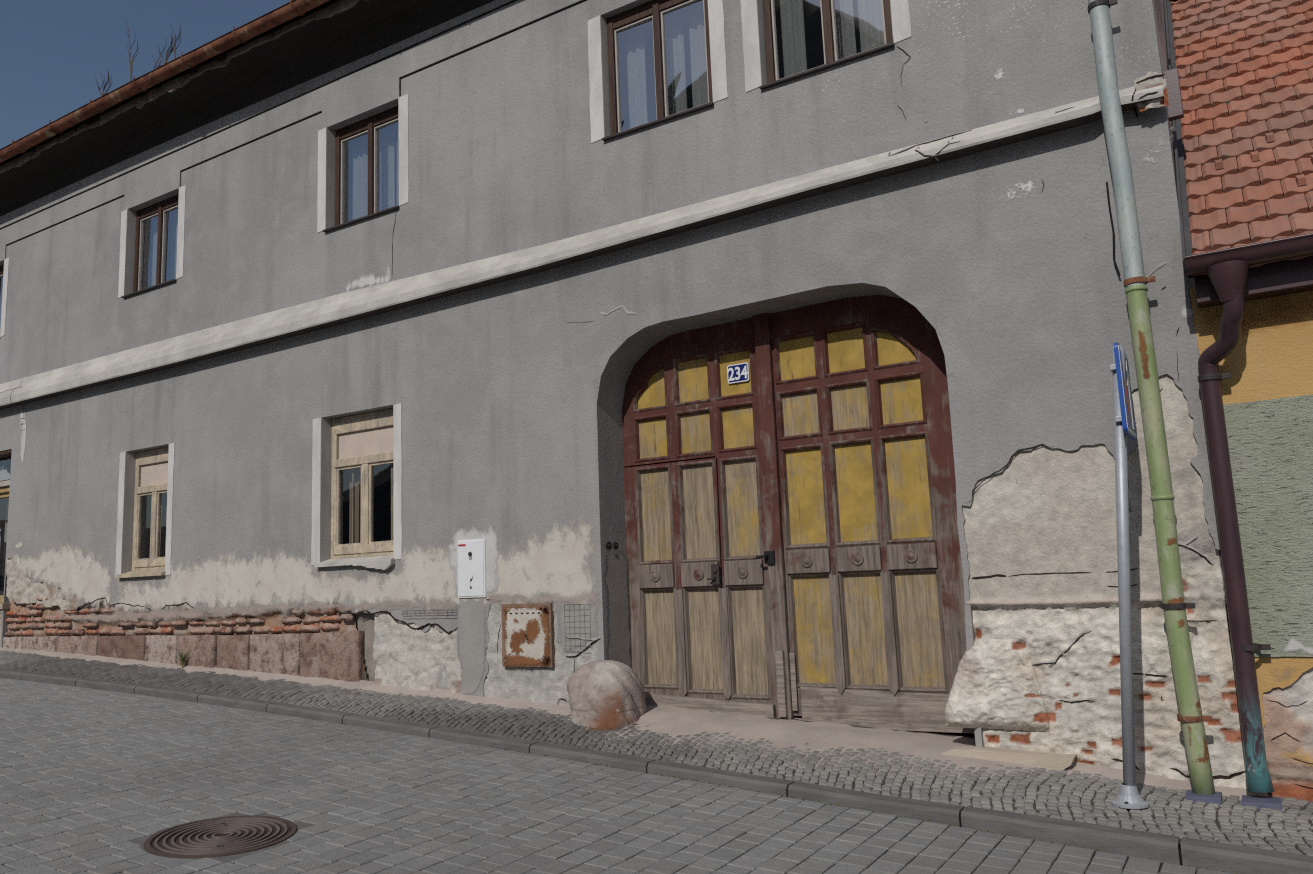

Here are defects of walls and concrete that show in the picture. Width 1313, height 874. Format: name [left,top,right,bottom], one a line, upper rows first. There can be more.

crack [888,46,973,163]
rust [1138,331,1150,379]
peeling [0,520,632,706]
crack [354,609,458,634]
flaking render [962,389,1190,780]
flaking render [1158,374,1246,789]
rust [1188,727,1211,770]
flaking render [1262,638,1313,801]